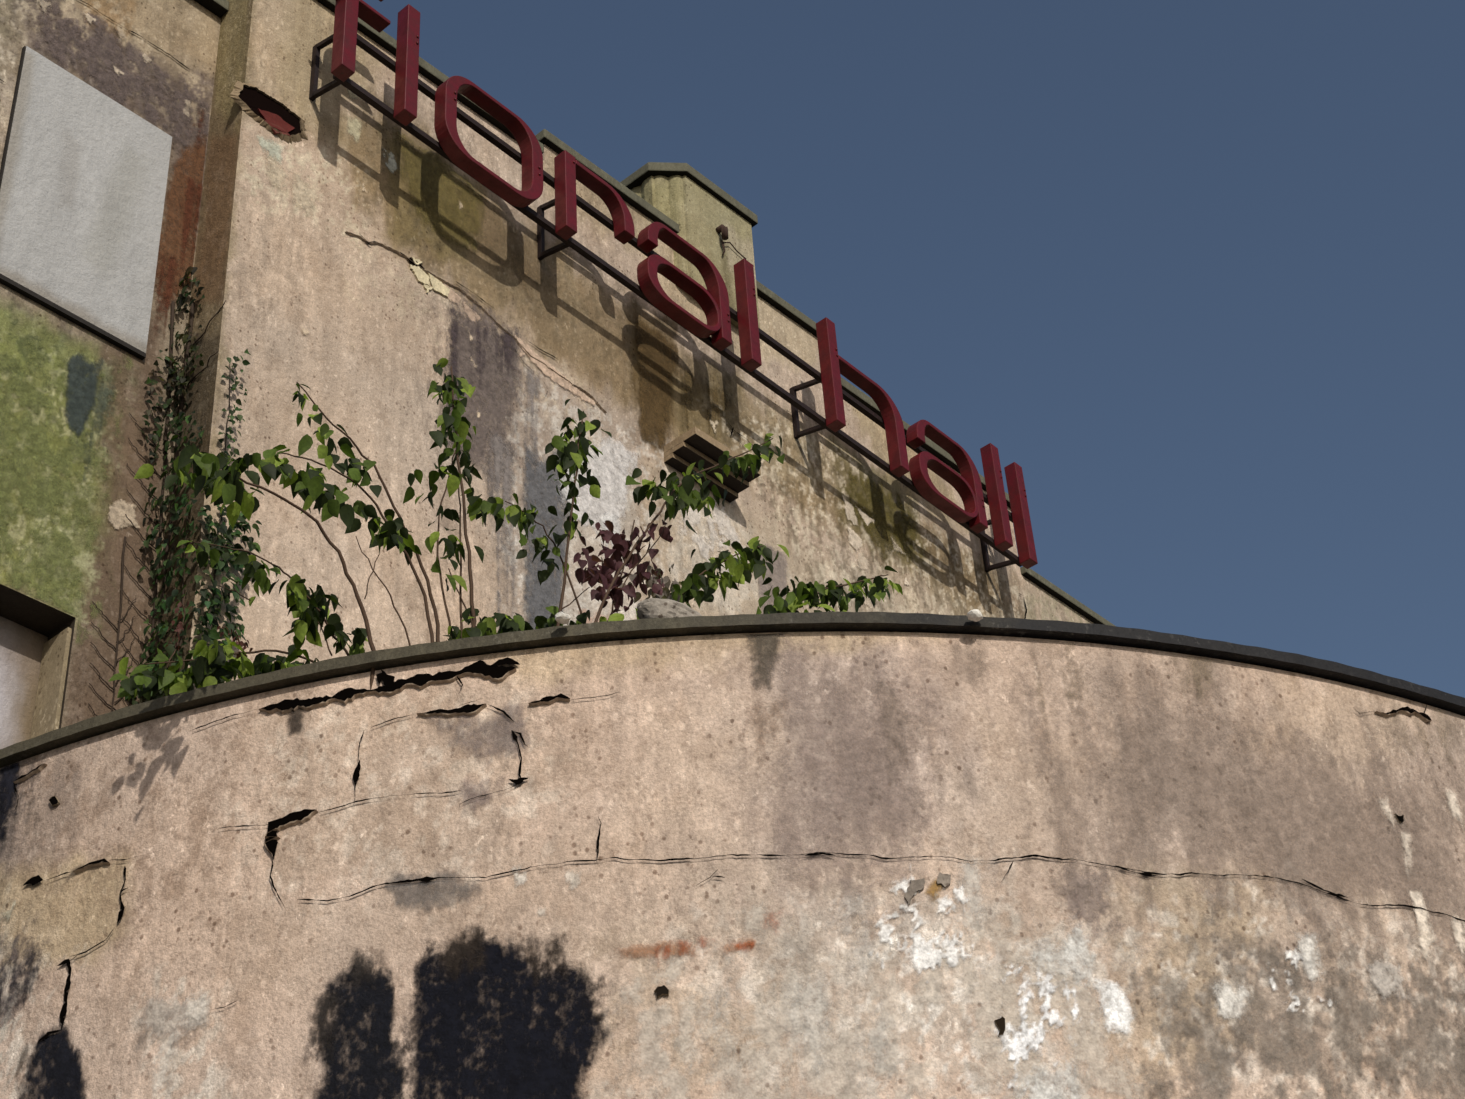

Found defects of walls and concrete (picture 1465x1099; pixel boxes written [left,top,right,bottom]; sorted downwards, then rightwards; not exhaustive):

spalling [230,81,308,144]
crack [345,231,607,414]
damp [65,355,113,461]
damp [0,762,34,839]
crack [188,657,1465,922]
peeling [904,872,951,906]
damp [0,936,37,1023]
crack [23,851,158,1044]
damp [310,927,608,1099]
spalling [994,1016,1005,1036]